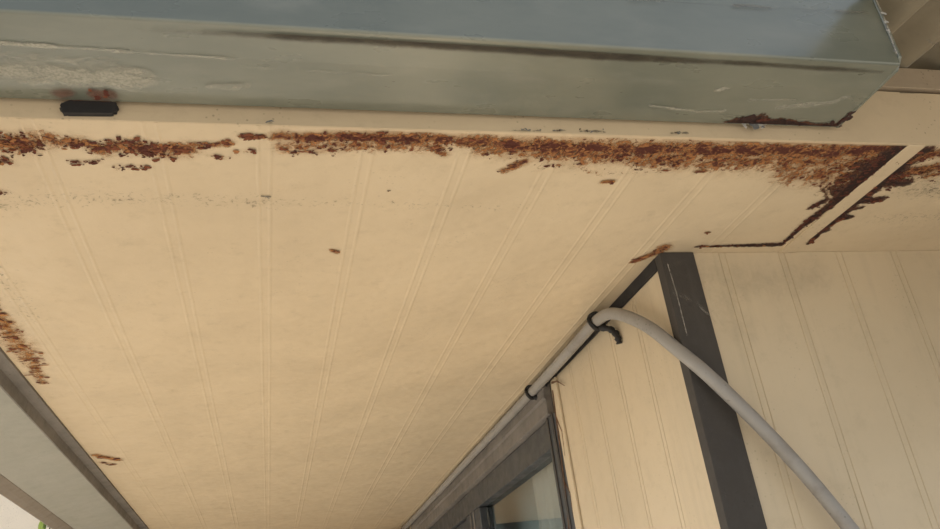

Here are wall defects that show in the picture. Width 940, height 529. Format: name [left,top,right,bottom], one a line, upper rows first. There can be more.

corrosion [724,111,856,127]
corrosion [0,130,940,249]
corrosion [0,309,50,384]